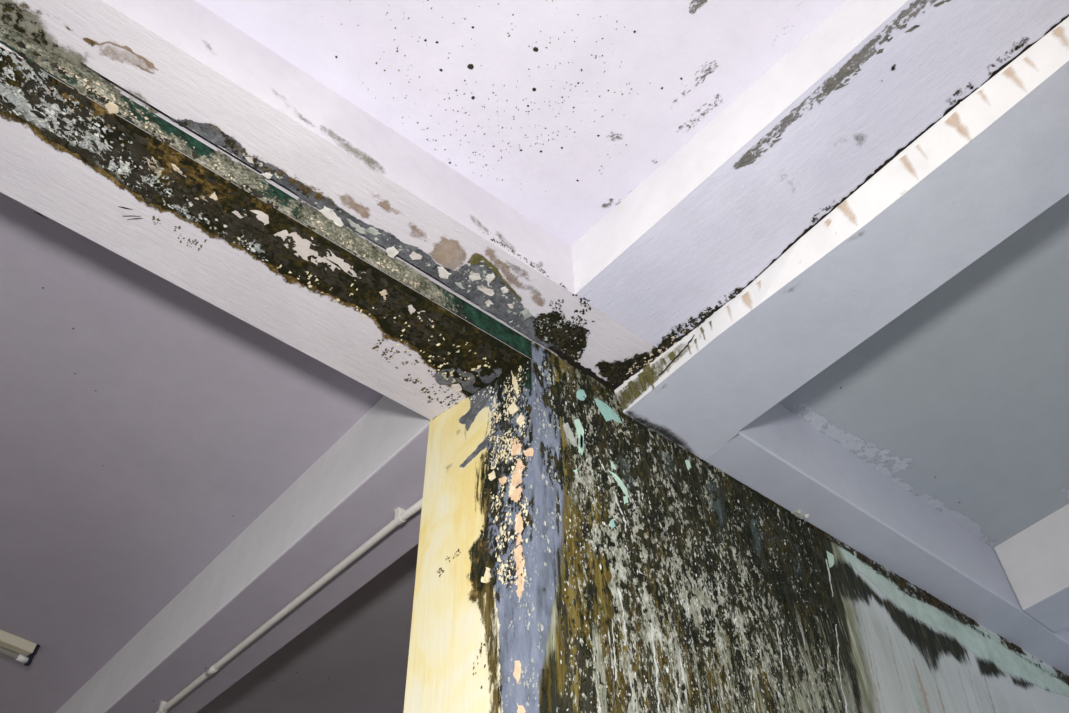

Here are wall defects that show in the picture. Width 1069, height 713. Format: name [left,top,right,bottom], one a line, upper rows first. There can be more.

water stain [0,0,97,75]
water stain [83,38,156,73]
peeling [59,67,167,139]
water stain [417,62,587,181]
water stain [478,222,549,288]
water stain [533,294,591,362]
water stain [0,45,535,713]
peeling [170,117,565,713]
corrosion [616,321,711,411]
water stain [533,348,985,713]
water stain [978,659,1030,688]
water stain [998,634,1069,685]